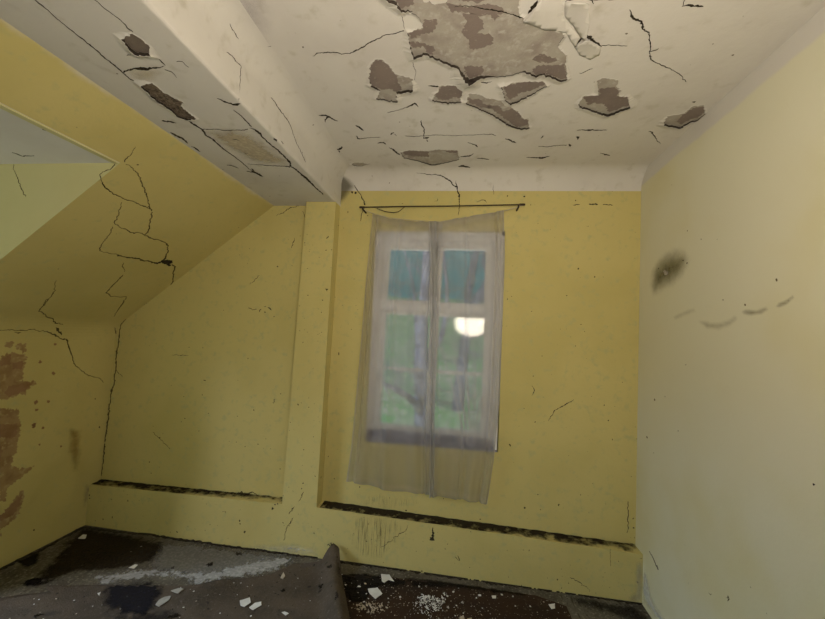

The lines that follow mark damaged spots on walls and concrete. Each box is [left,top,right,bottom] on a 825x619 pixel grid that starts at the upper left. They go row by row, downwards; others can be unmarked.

crack [35,0,188,81]
peeling [112,31,163,61]
peeling [131,79,200,122]
peeling [364,0,601,131]
crack [577,35,620,47]
peeling [573,77,638,119]
crack [630,10,686,82]
crack [162,100,323,195]
peeling [398,149,461,166]
crack [337,103,602,215]
crack [0,148,176,476]
peeling [0,341,37,536]